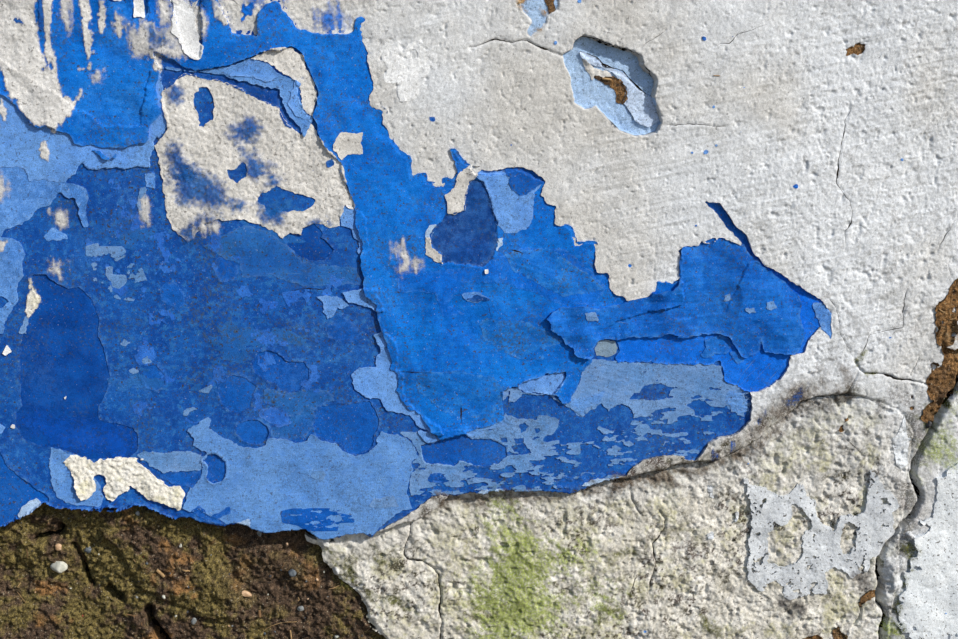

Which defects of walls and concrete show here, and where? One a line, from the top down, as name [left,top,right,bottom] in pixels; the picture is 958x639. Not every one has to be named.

peeling [0,0,832,540]
crack [808,291,922,400]
spalling [892,278,958,469]
crack [943,375,958,403]
crack [896,442,921,529]
spalling [0,502,386,639]
crack [404,523,442,638]
crack [626,512,665,603]
crack [855,560,885,639]